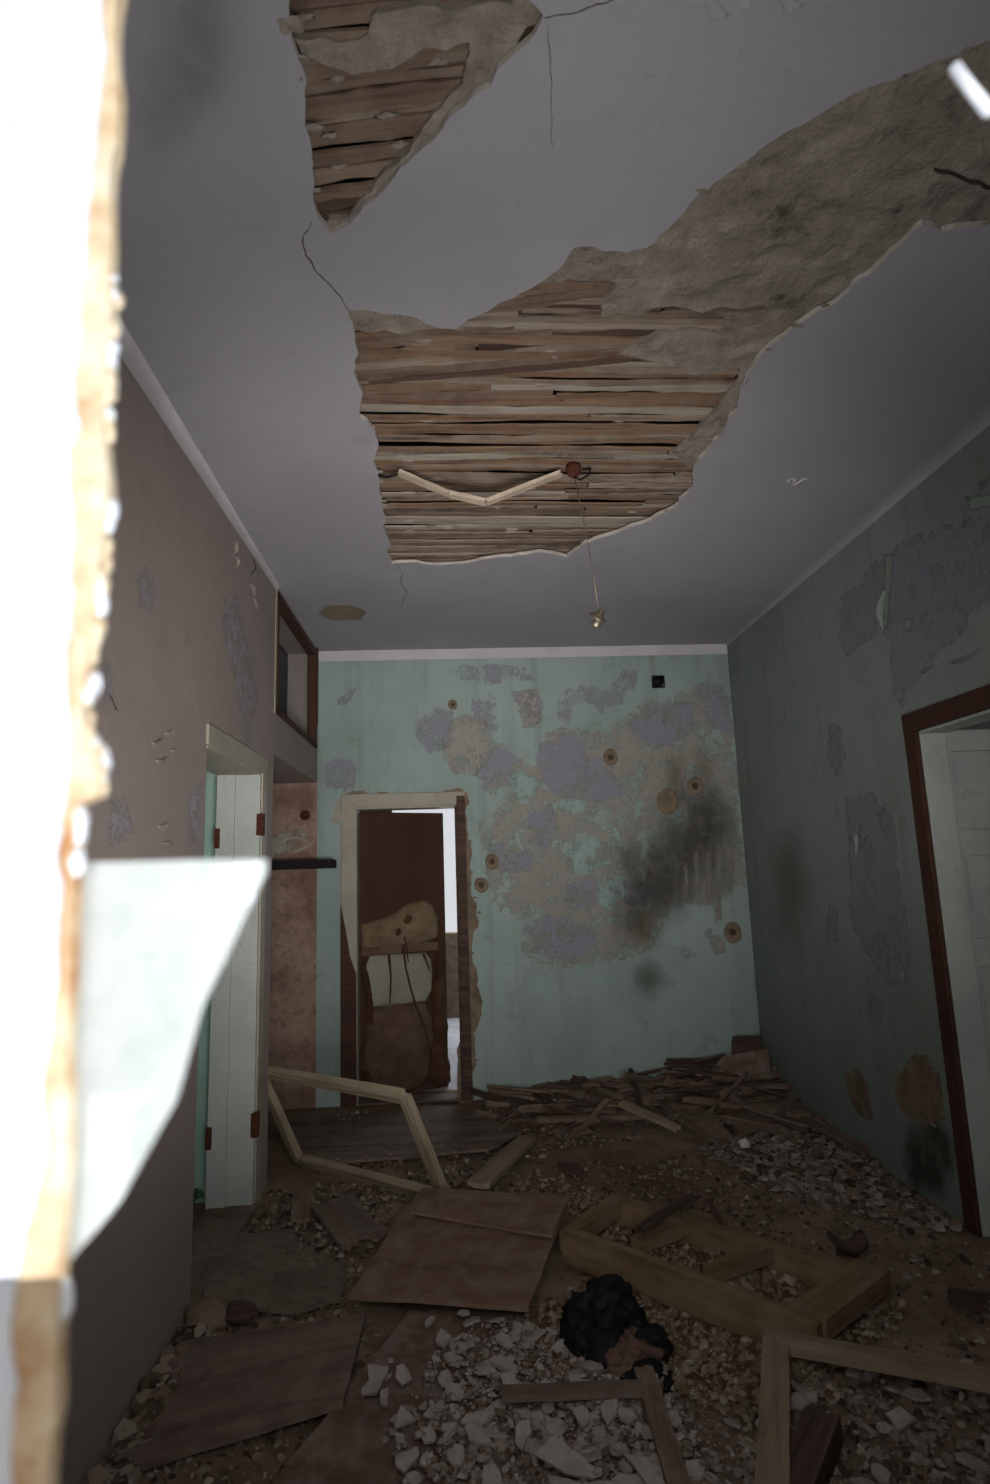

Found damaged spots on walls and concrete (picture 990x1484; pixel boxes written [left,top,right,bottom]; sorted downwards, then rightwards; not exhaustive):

spalling [275,0,541,228]
crack [545,0,613,146]
crack [302,222,348,310]
spalling [349,41,990,562]
spalling [603,748,618,766]
damp [630,801,732,928]
spalling [443,788,498,1103]
spalling [686,922,742,958]